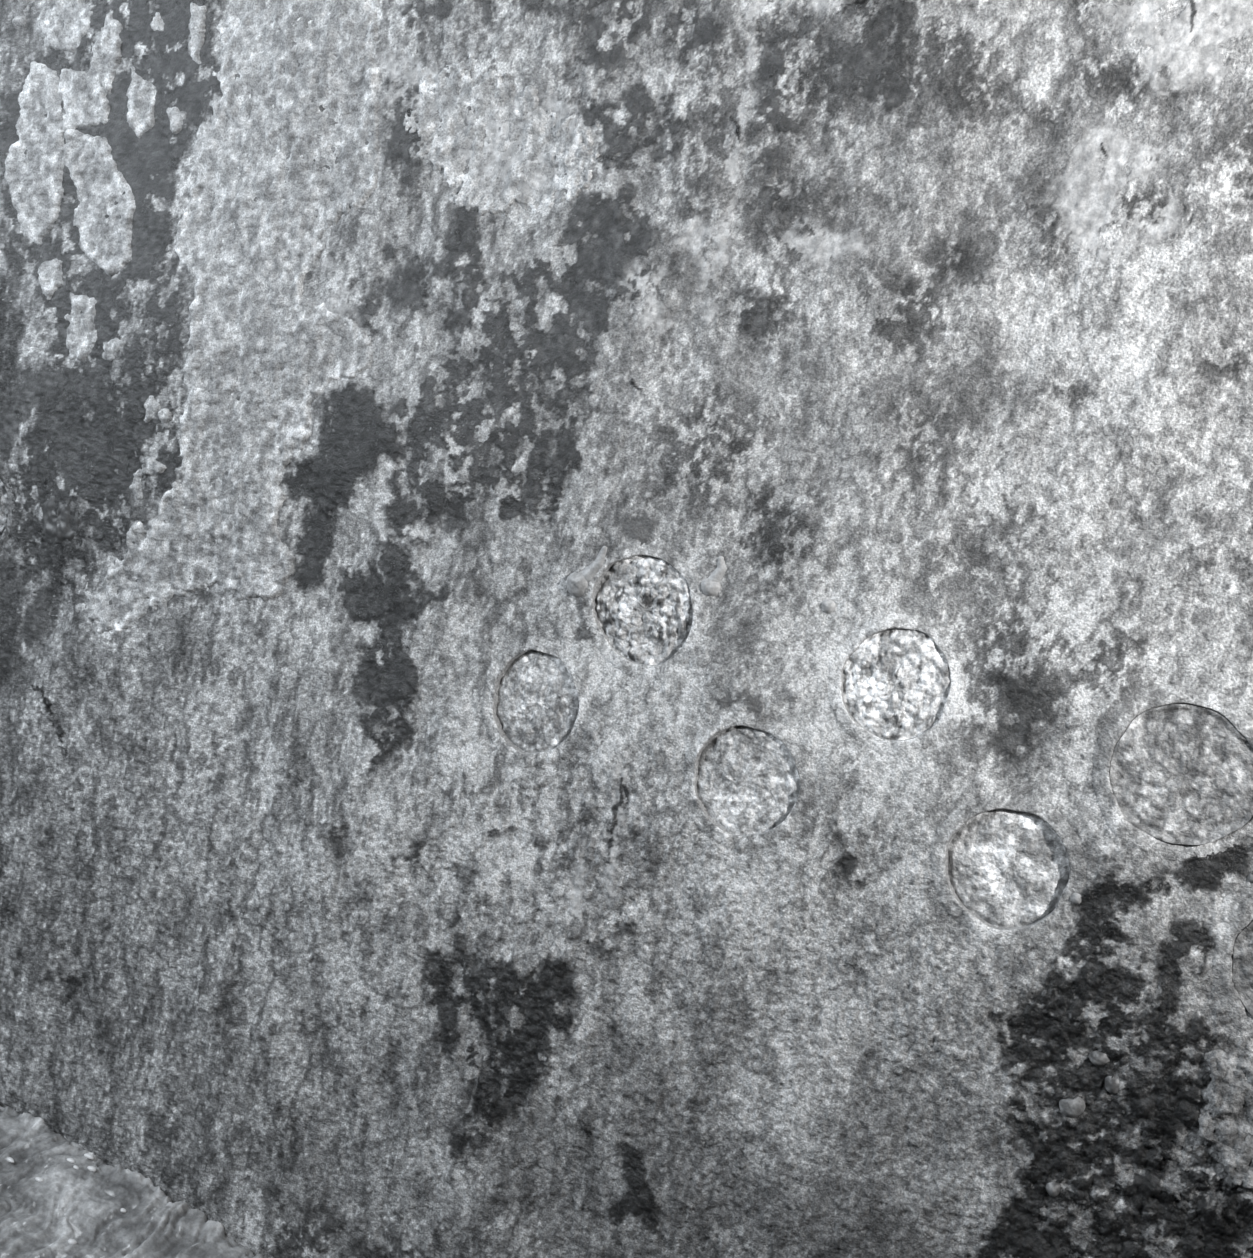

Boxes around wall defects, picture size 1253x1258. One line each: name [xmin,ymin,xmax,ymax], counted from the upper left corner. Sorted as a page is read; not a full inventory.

water stain [401,0,451,42]
water stain [522,0,725,82]
water stain [717,0,921,248]
water stain [701,266,769,342]
water stain [279,78,687,788]
water stain [987,673,1063,765]
water stain [391,838,431,874]
water stain [570,804,594,933]
water stain [601,765,649,904]
water stain [832,828,866,888]
water stain [422,908,581,1165]
water stain [965,837,1253,1258]